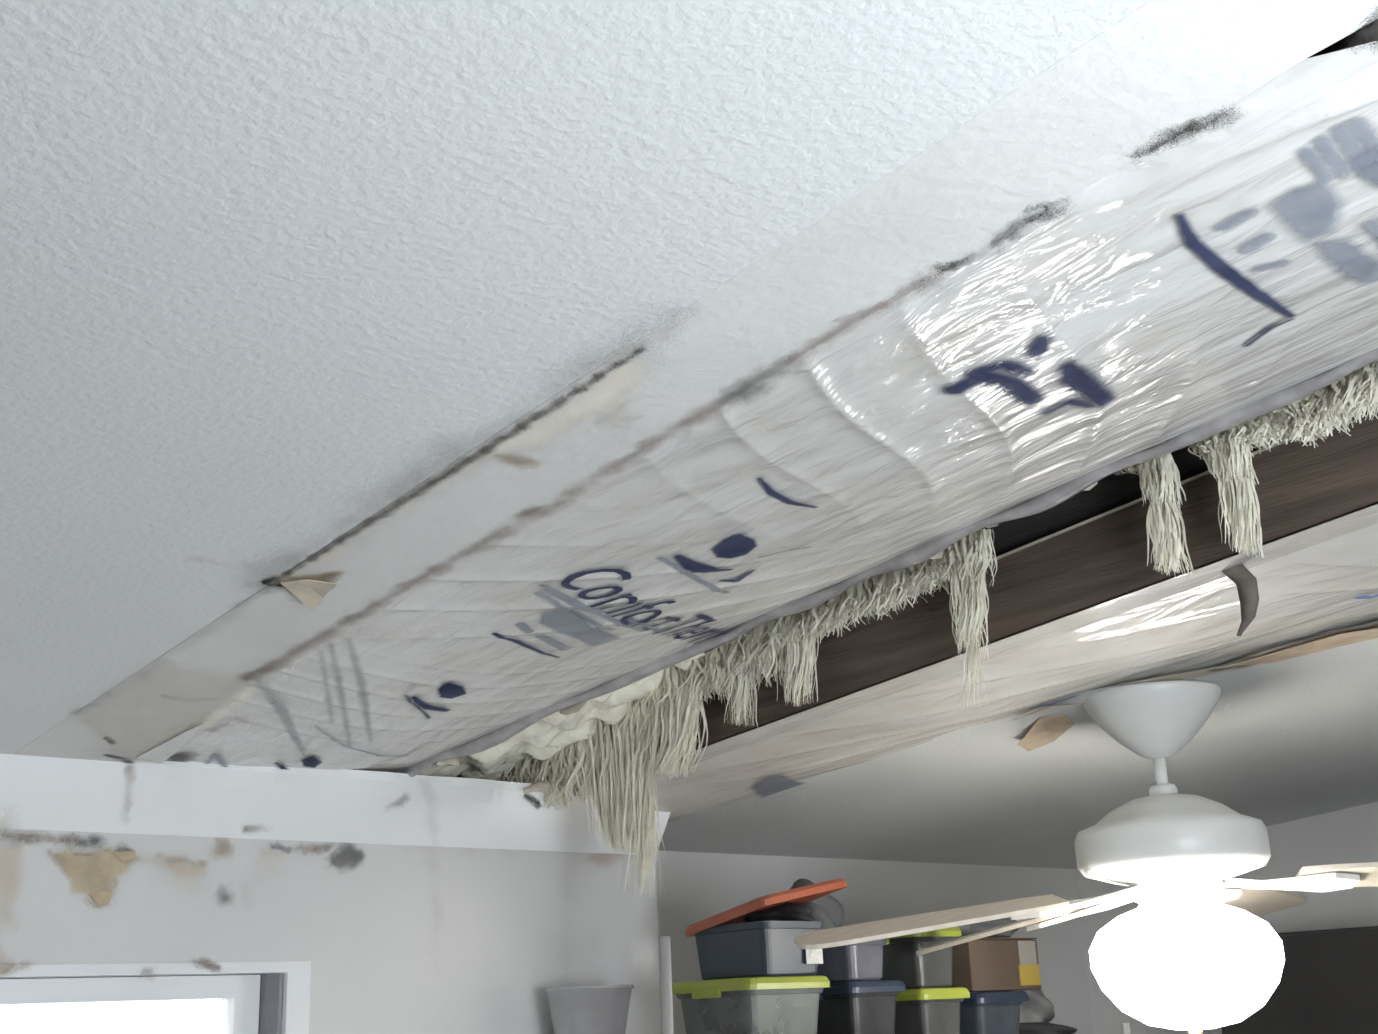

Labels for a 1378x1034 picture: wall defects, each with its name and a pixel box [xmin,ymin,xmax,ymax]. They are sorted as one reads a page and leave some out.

damp [1343,6,1378,56]
damp [1122,103,1251,166]
damp [932,197,1076,274]
peeling [1018,714,1074,751]
peeling [43,840,137,912]
damp [295,842,366,875]